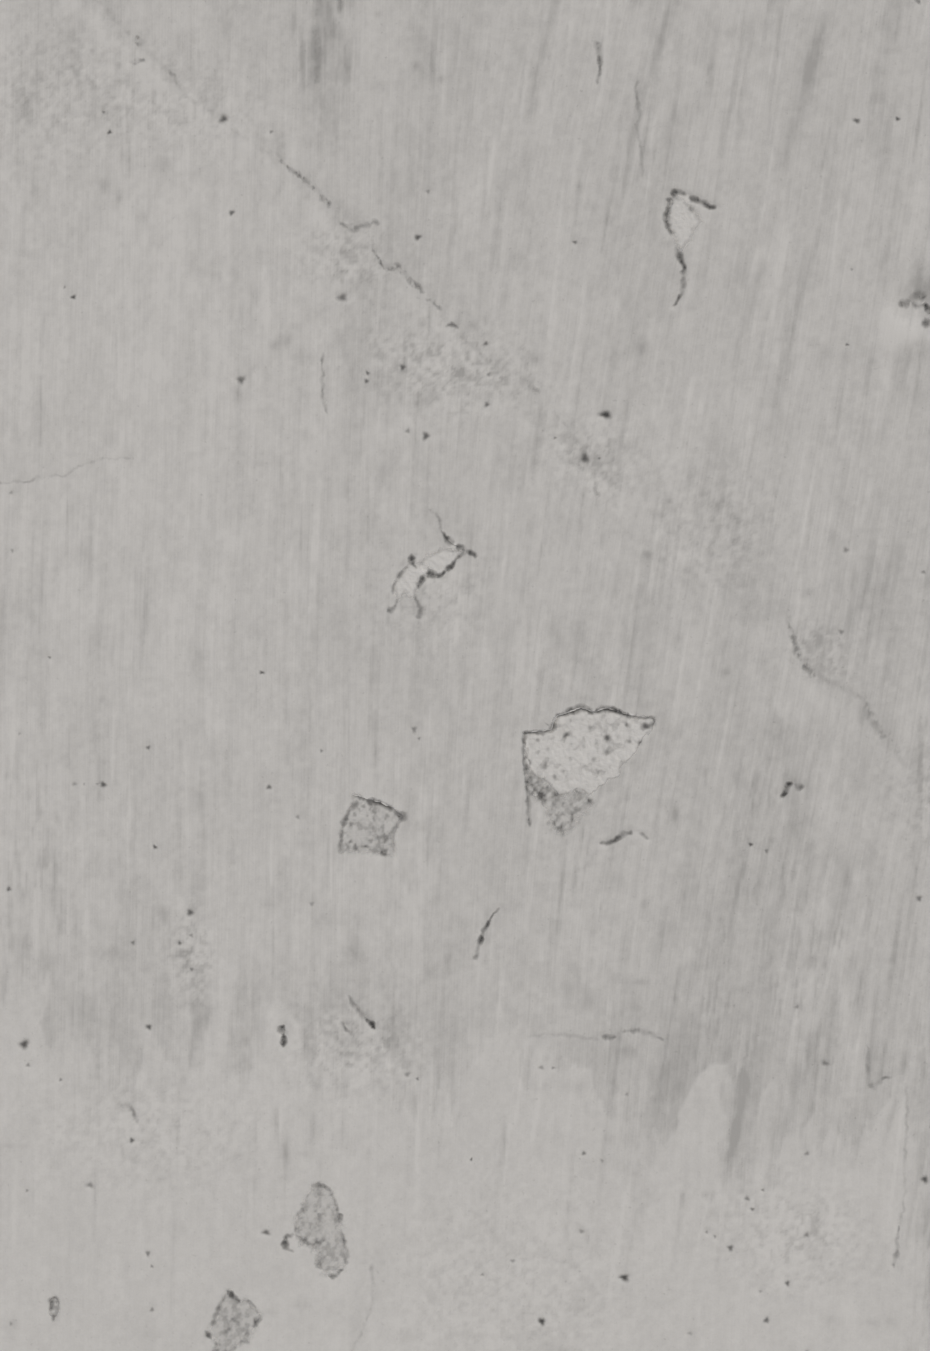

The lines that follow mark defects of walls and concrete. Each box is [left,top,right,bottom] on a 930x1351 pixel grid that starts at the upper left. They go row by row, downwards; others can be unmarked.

peeling [669,197,700,248]
spalling [394,526,475,599]
spalling [514,699,655,832]
spalling [340,786,408,855]